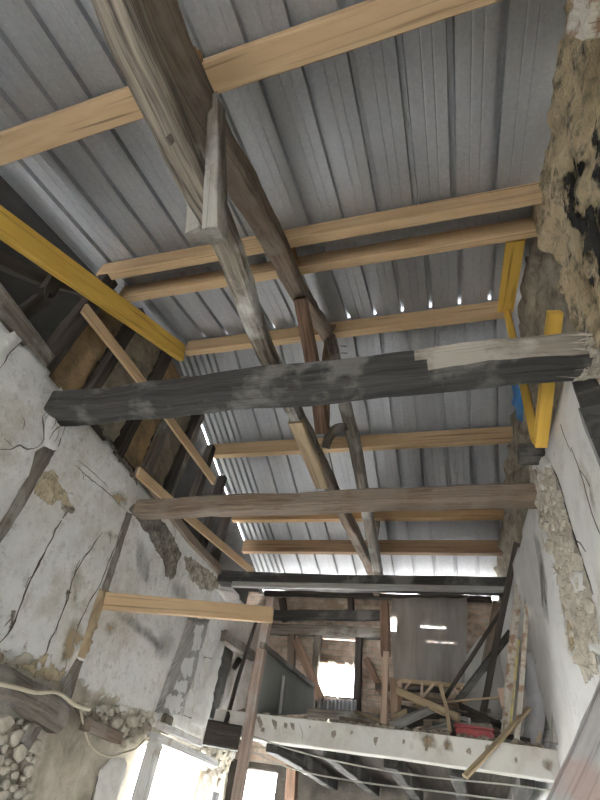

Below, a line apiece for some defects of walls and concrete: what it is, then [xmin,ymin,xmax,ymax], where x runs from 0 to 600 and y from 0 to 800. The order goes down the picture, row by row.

flaking render [563,119,600,287]
crack [0,412,65,451]
crack [0,515,65,643]
flaking render [34,470,76,523]
flaking render [129,504,240,601]
flaking render [529,455,600,684]
crack [551,465,593,594]
crack [560,424,600,534]
flaking render [0,653,65,682]